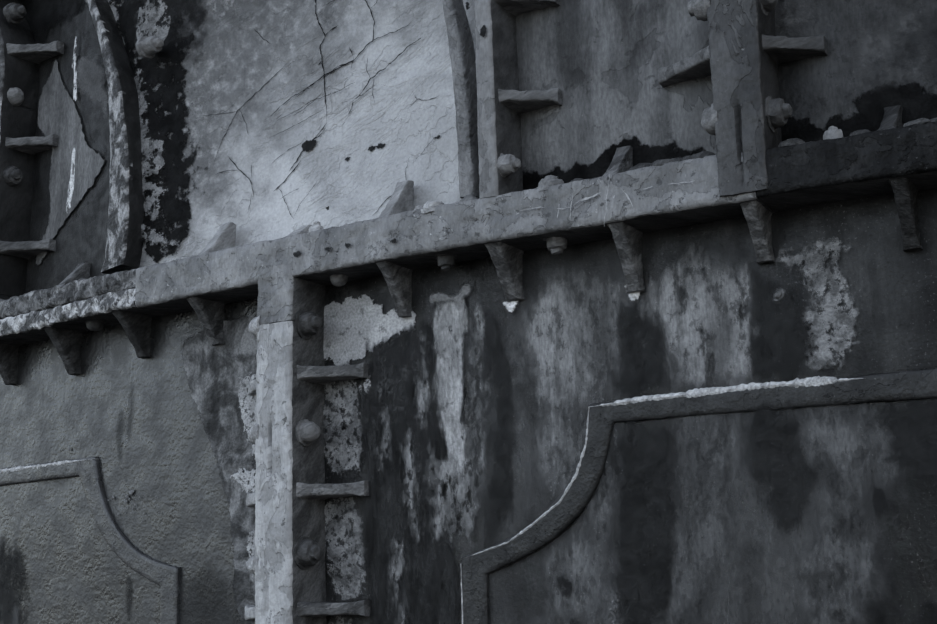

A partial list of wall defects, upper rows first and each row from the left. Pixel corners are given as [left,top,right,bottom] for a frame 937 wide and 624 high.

peeling [107,0,208,263]
crack [203,0,421,219]
damp [0,540,28,624]
damp [0,459,91,473]
peeling [182,314,257,624]
peeling [323,294,416,366]
damp [323,237,866,624]
damp [505,398,937,624]